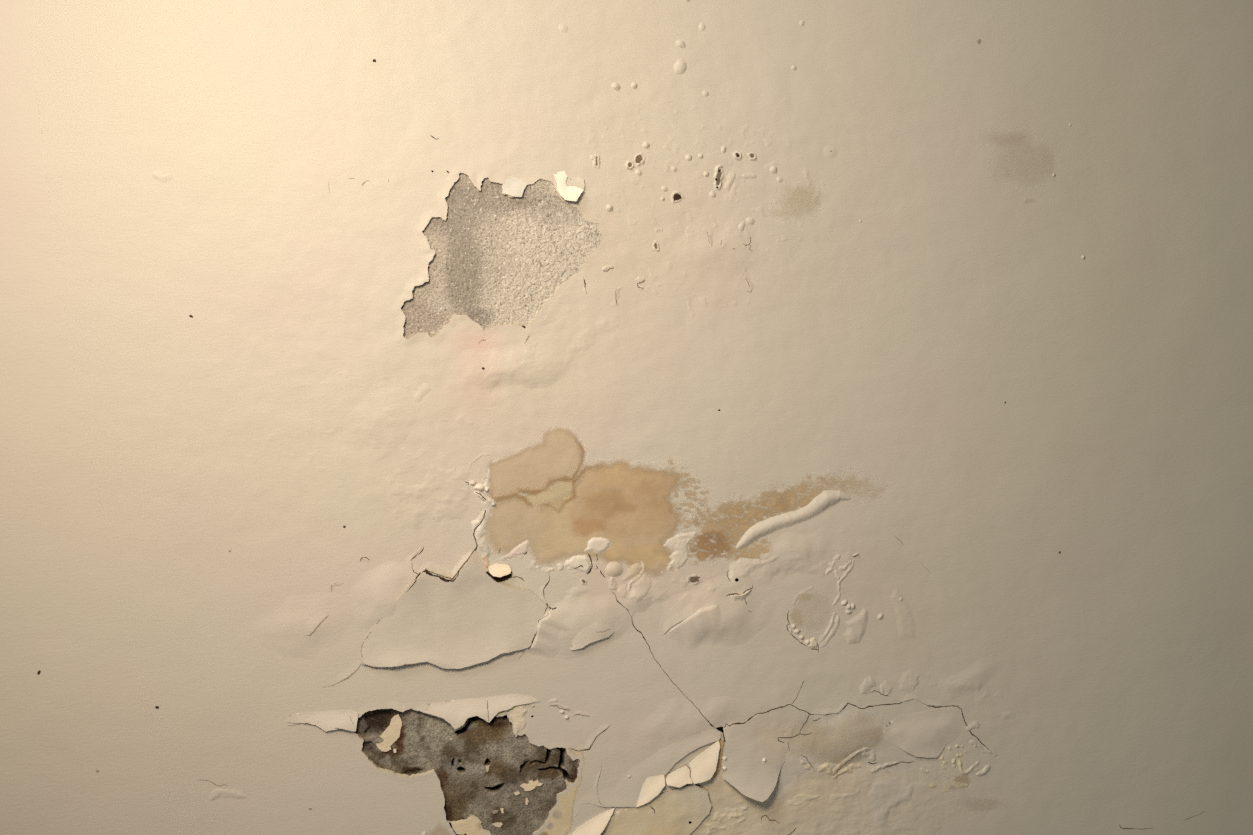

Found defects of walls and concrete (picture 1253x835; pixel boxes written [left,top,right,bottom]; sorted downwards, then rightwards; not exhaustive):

flaking render [392,165,610,349]
crack [306,557,370,636]
crack [327,642,409,687]
crack [405,510,486,589]
leakage [487,430,835,575]
crack [521,570,989,750]
crack [573,724,610,812]
peeling [286,694,969,835]